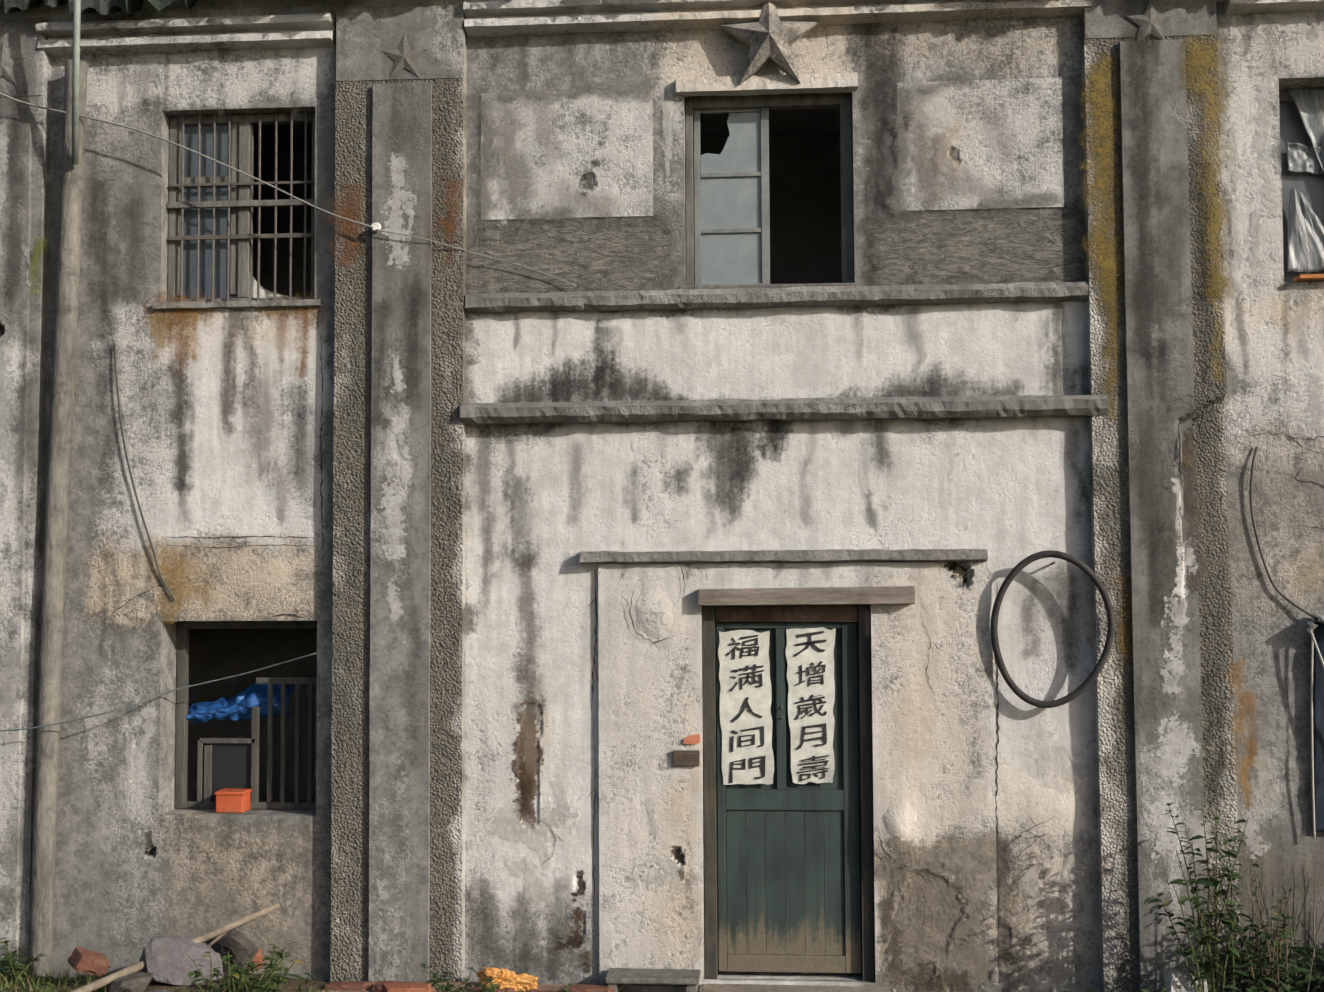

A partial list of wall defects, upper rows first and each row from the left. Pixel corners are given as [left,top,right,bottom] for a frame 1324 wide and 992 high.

peeling [381,153,417,271]
damp [170,367,190,489]
corrosion [157,309,214,364]
damp [221,308,244,432]
corrosion [300,307,309,378]
damp [499,321,684,403]
crack [1162,394,1324,488]
spalling [1160,426,1211,695]
spalling [510,674,545,833]
crack [538,573,673,941]
peeling [1142,711,1219,868]
corrosion [1229,661,1256,808]